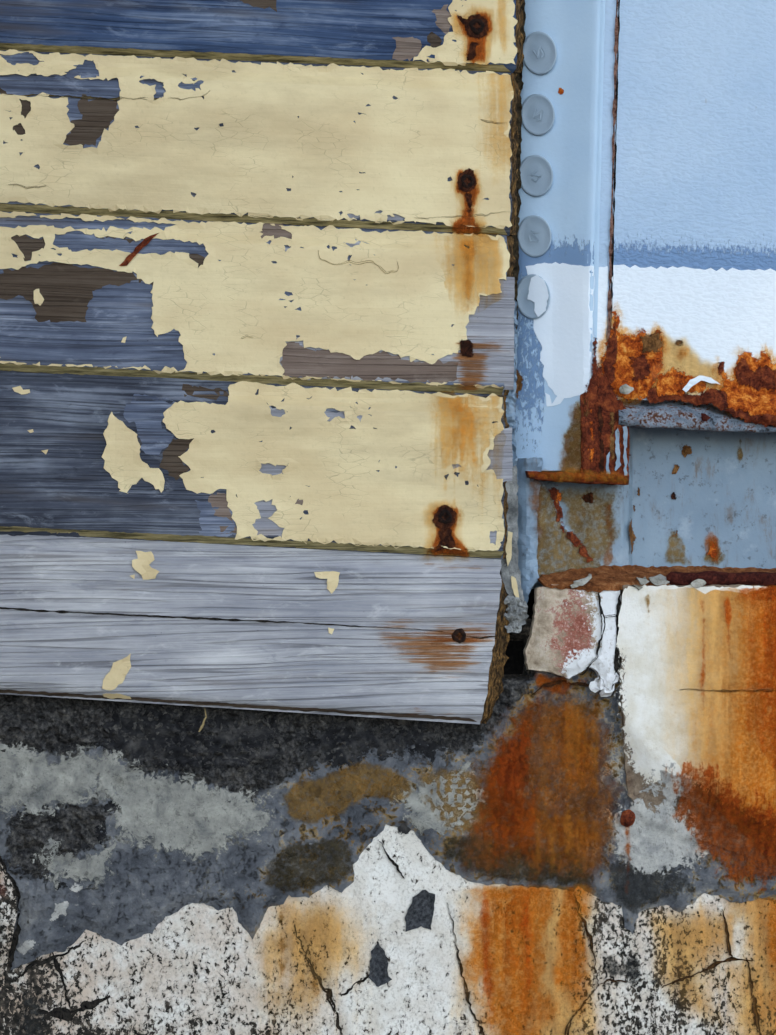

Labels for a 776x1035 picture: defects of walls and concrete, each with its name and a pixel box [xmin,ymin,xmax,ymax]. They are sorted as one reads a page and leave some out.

peeling [0,0,459,148]
corrosion [458,13,491,61]
peeling [0,211,237,538]
peeling [279,277,515,390]
corrosion [571,311,776,485]
corrosion [433,505,467,555]
corrosion [666,571,776,594]
spalling [0,584,776,975]
crack [0,856,145,1035]
crack [294,926,369,1034]
crack [447,903,485,1035]
crack [662,910,762,1035]